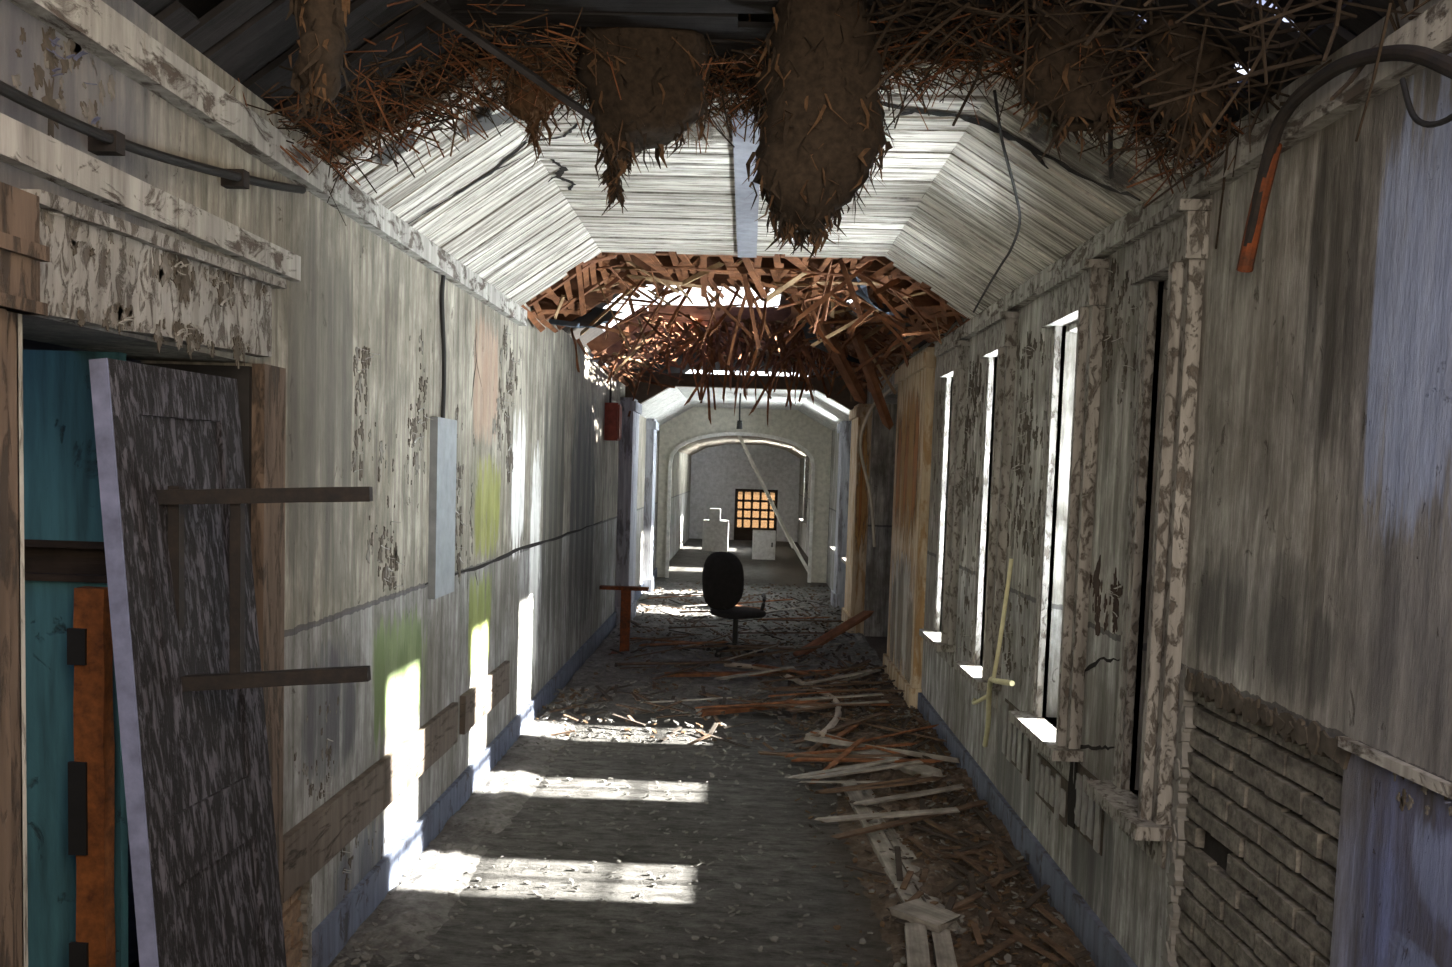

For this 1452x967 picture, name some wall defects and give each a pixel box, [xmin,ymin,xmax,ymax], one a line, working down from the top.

peeling [44,210,114,267]
peeling [44,247,270,369]